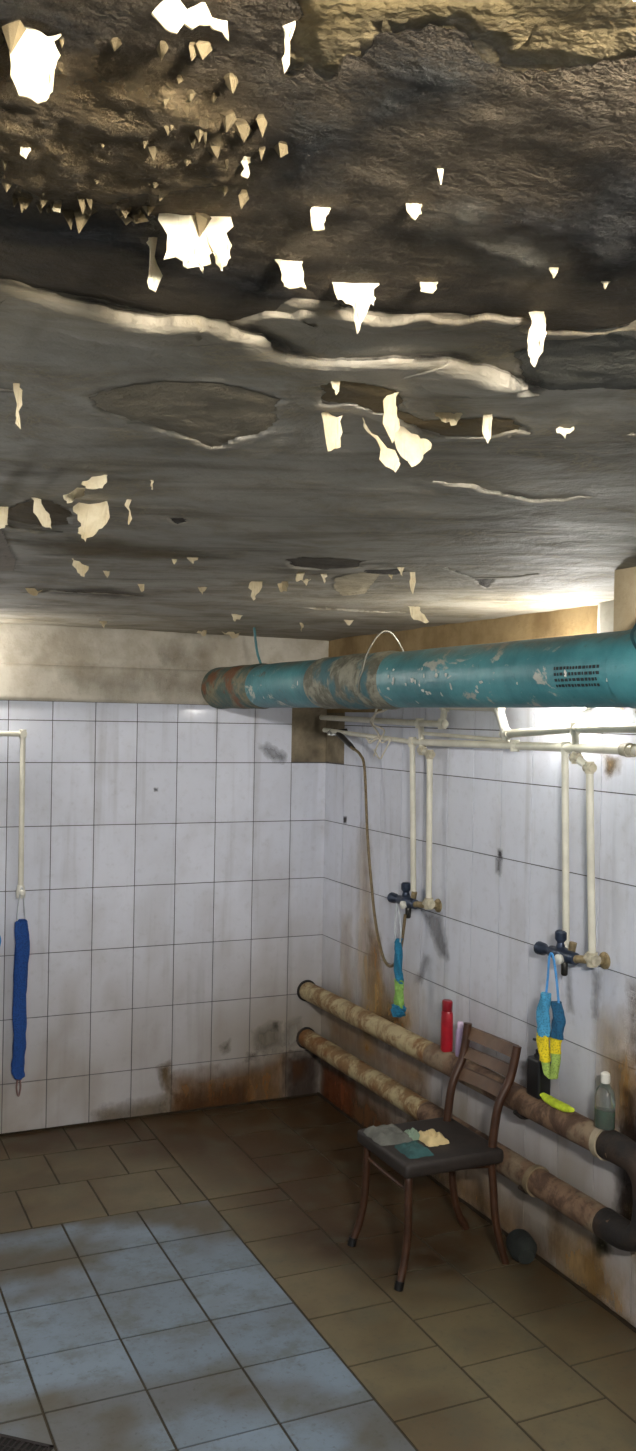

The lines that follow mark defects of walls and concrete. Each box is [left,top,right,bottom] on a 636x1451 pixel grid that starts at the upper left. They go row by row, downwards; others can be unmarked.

spalling [0,0,636,398]
peeling [13,383,23,429]
spalling [62,372,574,472]
spalling [248,554,429,623]
corrosion [98,1054,393,1128]
corrosion [436,1172,515,1232]